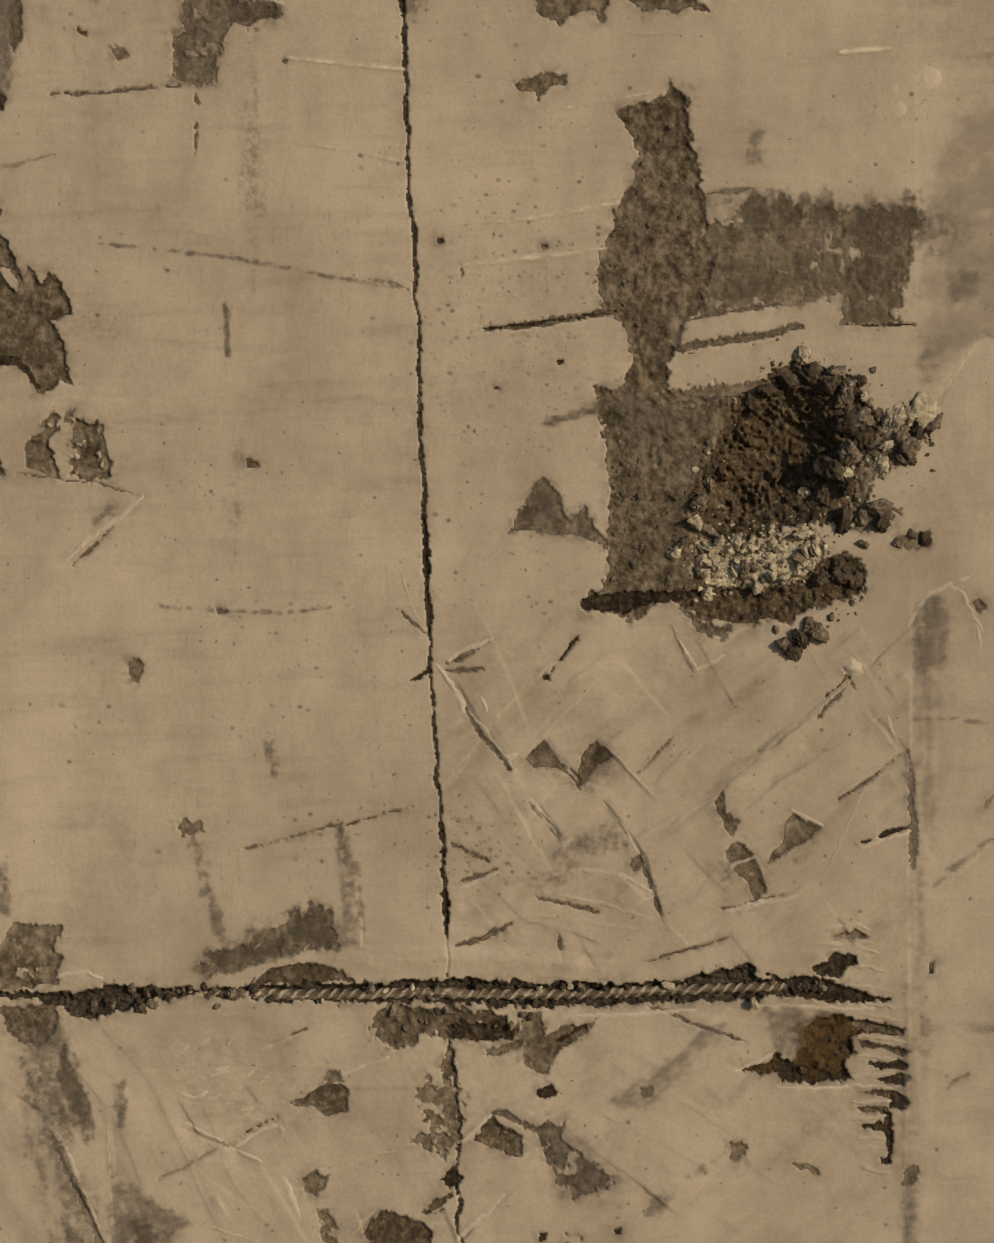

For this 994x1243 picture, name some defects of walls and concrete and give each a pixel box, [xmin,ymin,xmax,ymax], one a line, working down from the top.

peeling [50,0,284,104]
crack [112,243,290,268]
spalling [0,237,72,393]
spalling [482,82,948,662]
spalling [24,411,124,492]
crack [319,0,450,938]
crack [245,810,400,850]
spalling [0,923,63,991]
spalling [195,901,339,979]
spalling [0,1005,116,1243]
crack [0,952,891,1242]
spalling [368,999,591,1099]